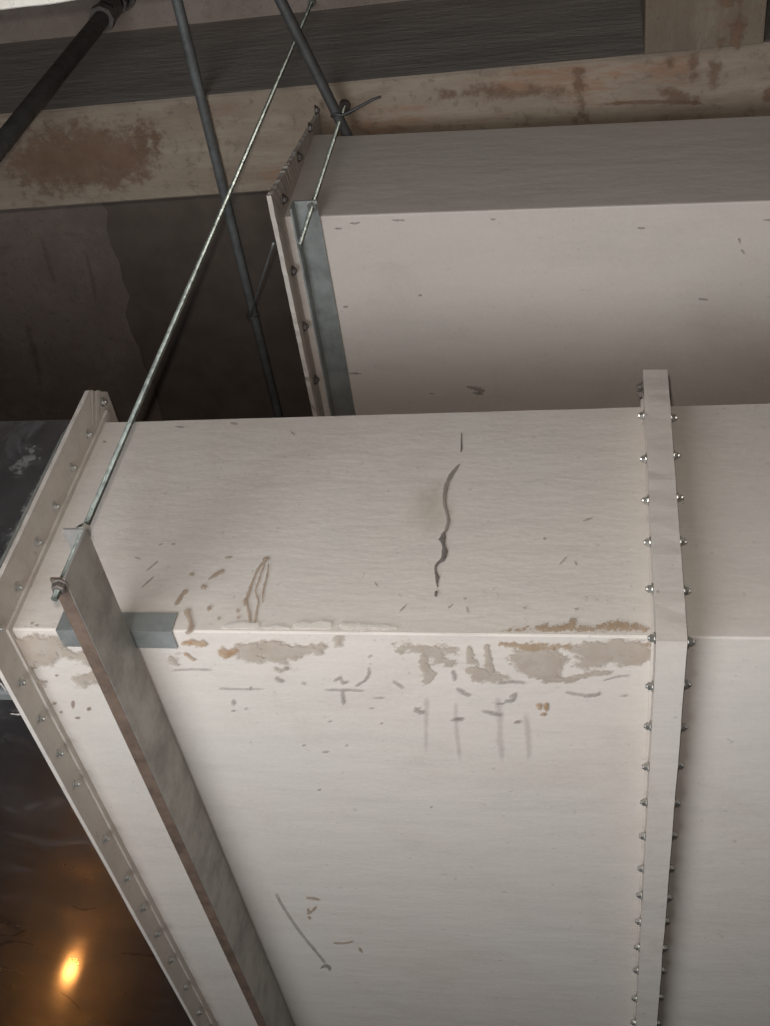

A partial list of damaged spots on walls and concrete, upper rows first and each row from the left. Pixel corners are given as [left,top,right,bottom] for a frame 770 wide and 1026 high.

crack [434,433,462,597]
peeling [235,637,344,673]
peeling [391,639,651,684]